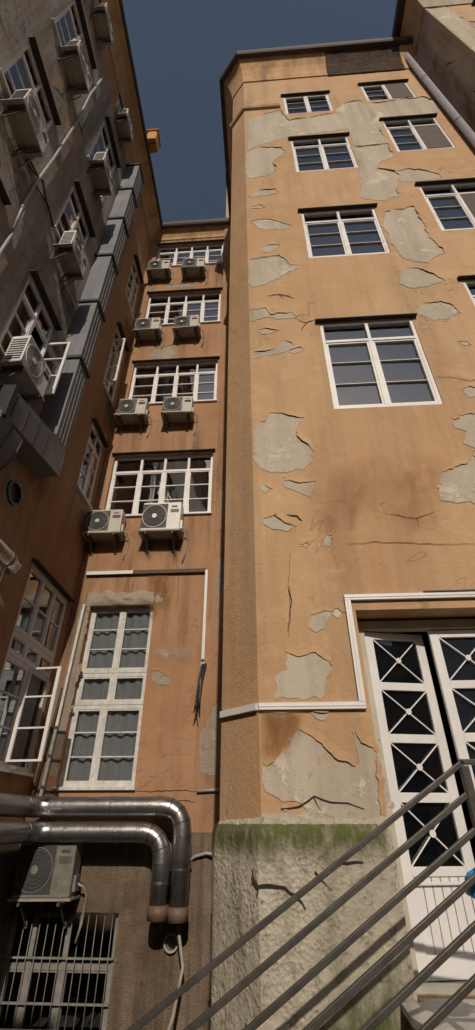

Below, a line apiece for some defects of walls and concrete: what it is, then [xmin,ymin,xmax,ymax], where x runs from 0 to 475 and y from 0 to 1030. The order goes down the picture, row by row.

flaking render [246,96,462,323]
flaking render [253,410,317,497]
flaking render [436,410,475,504]
crack [286,554,294,637]
flaking render [308,601,346,632]
flaking render [261,646,395,818]
crack [252,870,306,910]
crack [315,860,364,890]